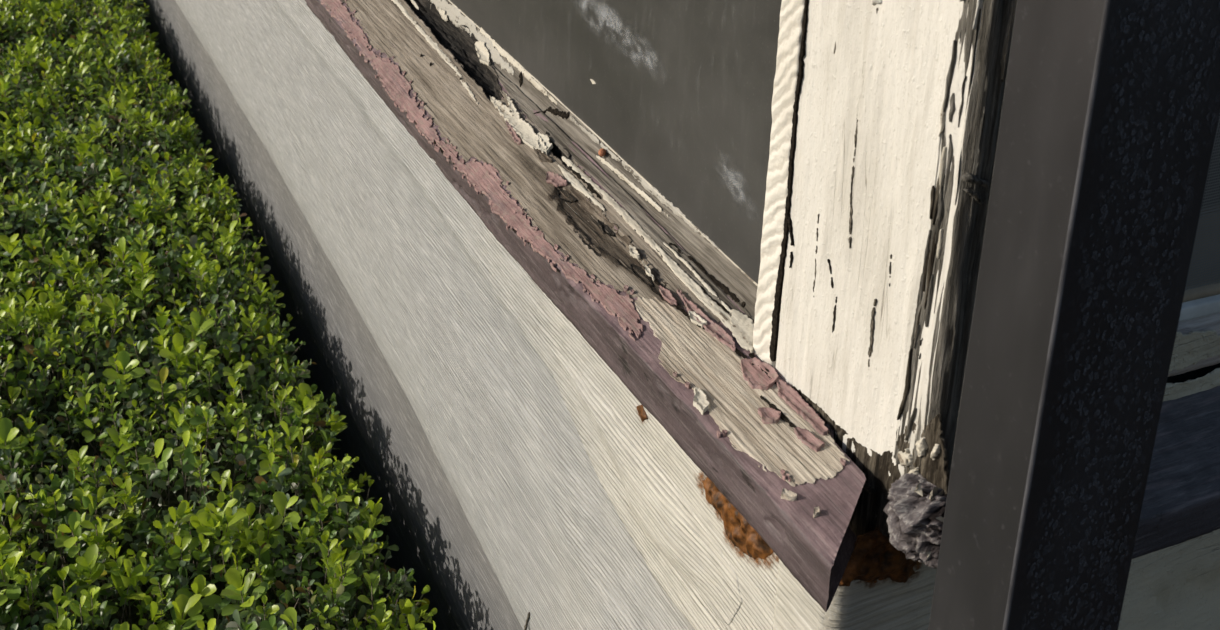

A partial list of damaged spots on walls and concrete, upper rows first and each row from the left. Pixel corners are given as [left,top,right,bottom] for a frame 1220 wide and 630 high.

peeling [1001,0,1017,82]
peeling [321,0,850,501]
peeling [894,0,990,501]
peeling [1169,330,1220,372]
rust [697,473,778,567]
rust [839,528,922,588]